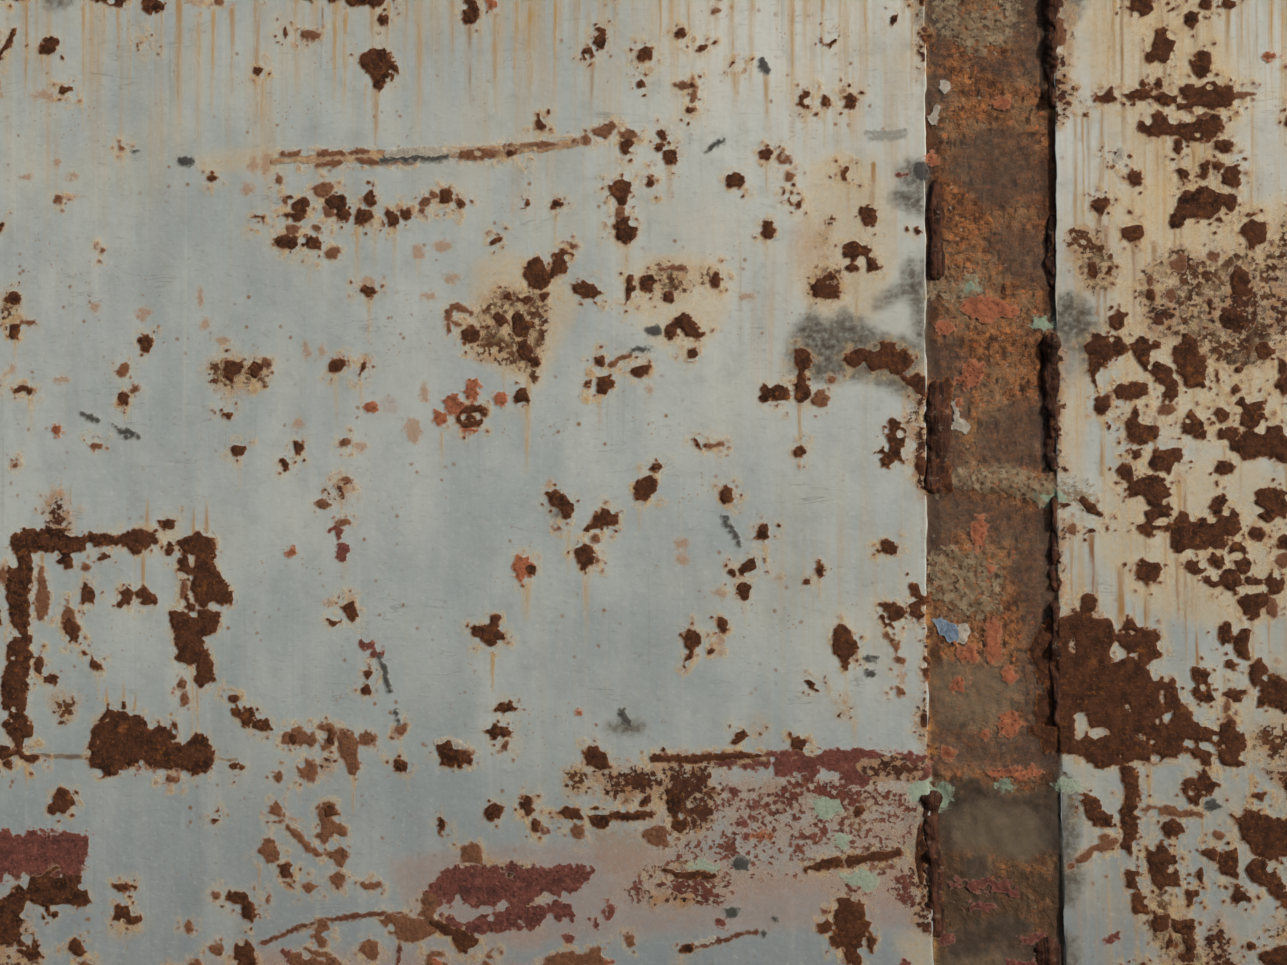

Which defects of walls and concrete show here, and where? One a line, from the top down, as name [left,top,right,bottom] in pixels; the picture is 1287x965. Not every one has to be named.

rust [83,0,235,79]
rust [251,0,407,129]
rust [248,154,474,267]
rust [571,119,679,246]
rust [725,171,748,198]
rust [407,235,751,443]
rust [752,0,1287,965]
rust [716,516,781,605]
rust [466,613,513,684]
rust [0,490,413,965]
rust [483,572,958,965]
peeling [409,890,440,921]